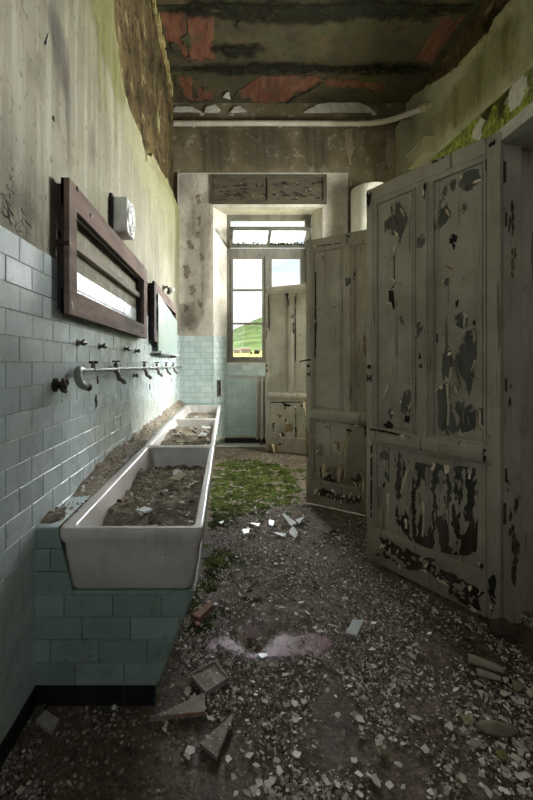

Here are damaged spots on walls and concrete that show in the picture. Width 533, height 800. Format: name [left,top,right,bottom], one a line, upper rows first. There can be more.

leakage [50,9,70,127]
flaking render [114,0,399,192]
leakage [183,44,423,76]
flaking render [413,12,466,67]
flaking render [471,116,485,143]
leakage [481,86,512,131]
flaking render [476,0,523,47]
flaking render [504,70,530,113]